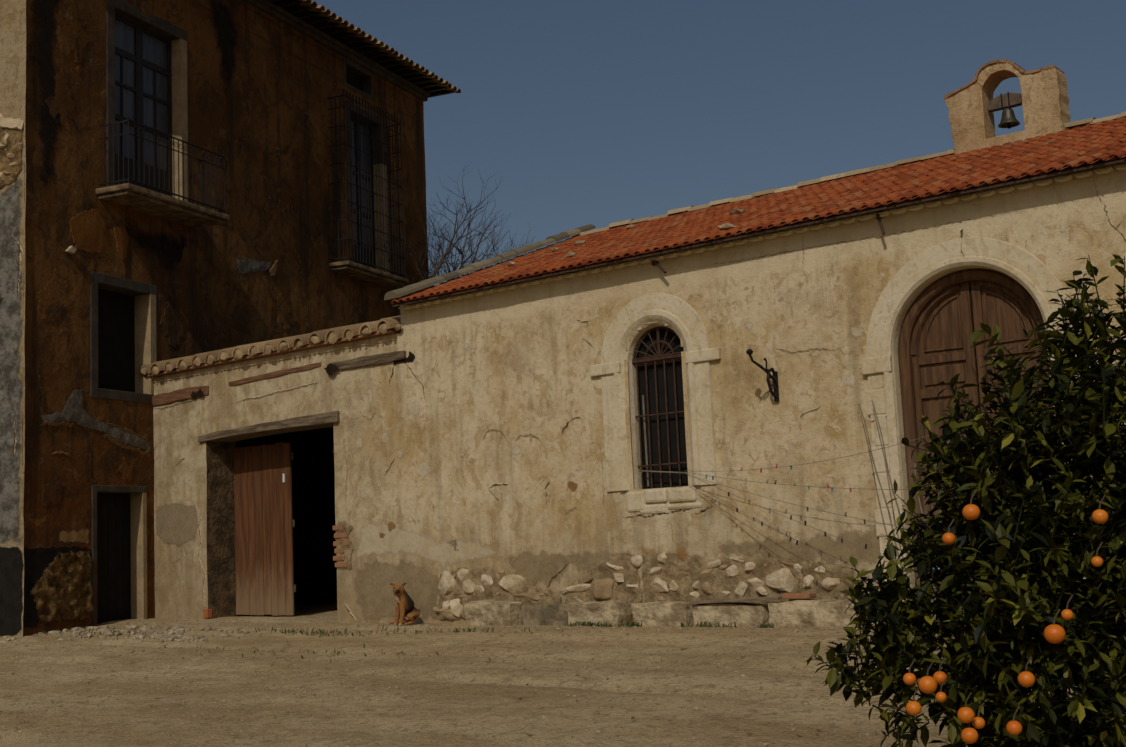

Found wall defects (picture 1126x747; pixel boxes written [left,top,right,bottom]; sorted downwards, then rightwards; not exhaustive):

crack [1093,178,1126,241]
flaking render [40,388,151,457]
flaking render [332,521,354,570]